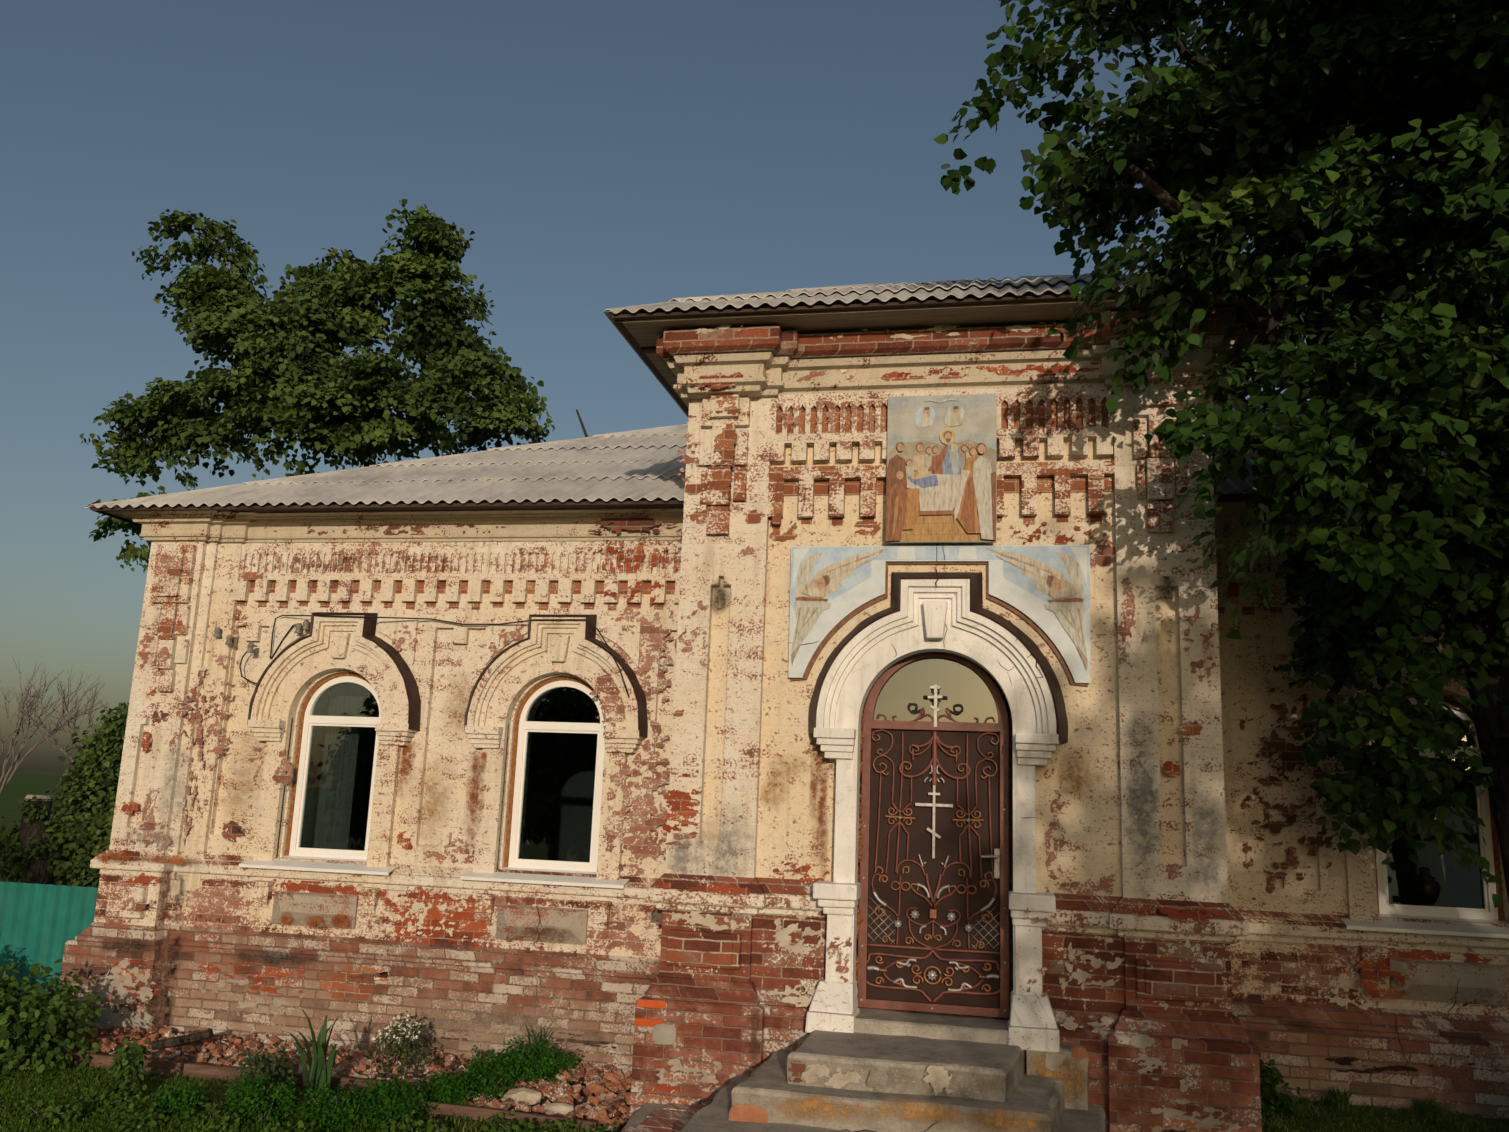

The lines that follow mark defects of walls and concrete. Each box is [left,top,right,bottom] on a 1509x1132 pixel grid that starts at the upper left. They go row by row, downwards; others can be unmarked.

peeling [881,362,1099,381]
peeling [743,466,860,542]
peeling [121,372,751,877]
leakage [1132,740,1154,859]
peeling [1231,664,1342,900]
peeling [117,873,163,915]
peeling [272,879,362,901]
peeling [372,886,651,959]
peeling [671,911,747,932]
peeling [762,912,852,983]
peeling [1027,937,1124,997]
spalling [789,1060,953,1096]